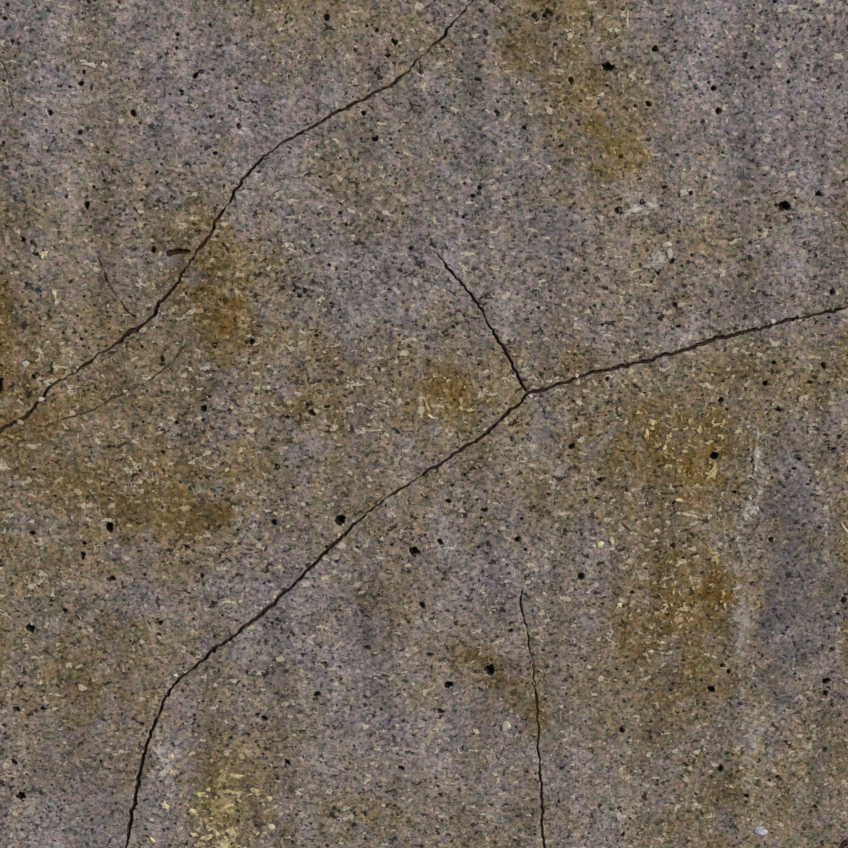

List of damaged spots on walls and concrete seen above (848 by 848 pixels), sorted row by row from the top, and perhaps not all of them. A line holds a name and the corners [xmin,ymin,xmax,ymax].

crack [0,0,474,451]
crack [125,249,848,848]